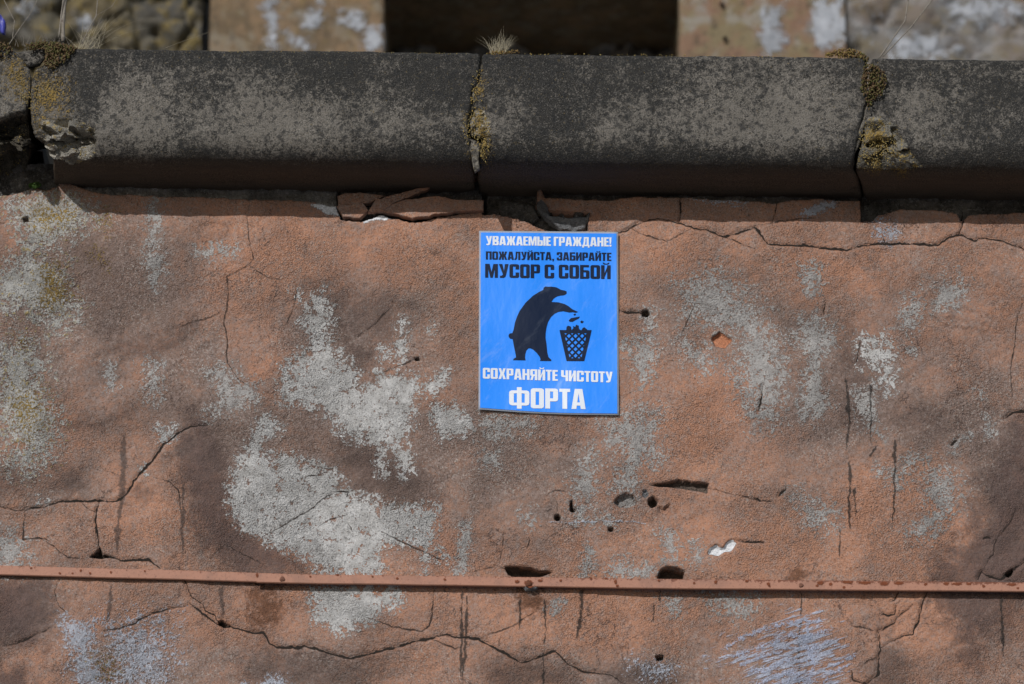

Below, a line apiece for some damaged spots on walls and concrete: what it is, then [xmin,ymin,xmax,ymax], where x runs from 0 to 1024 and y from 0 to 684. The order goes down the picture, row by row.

crack [176,200,298,386]
peeling [0,114,1024,507]
crack [618,201,1024,251]
crack [0,424,208,646]
water stain [180,417,302,574]
crack [103,580,625,684]
peeling [198,284,545,640]
peeling [513,249,999,590]
rust [785,568,904,588]
water stain [838,462,857,556]
crack [851,593,927,684]